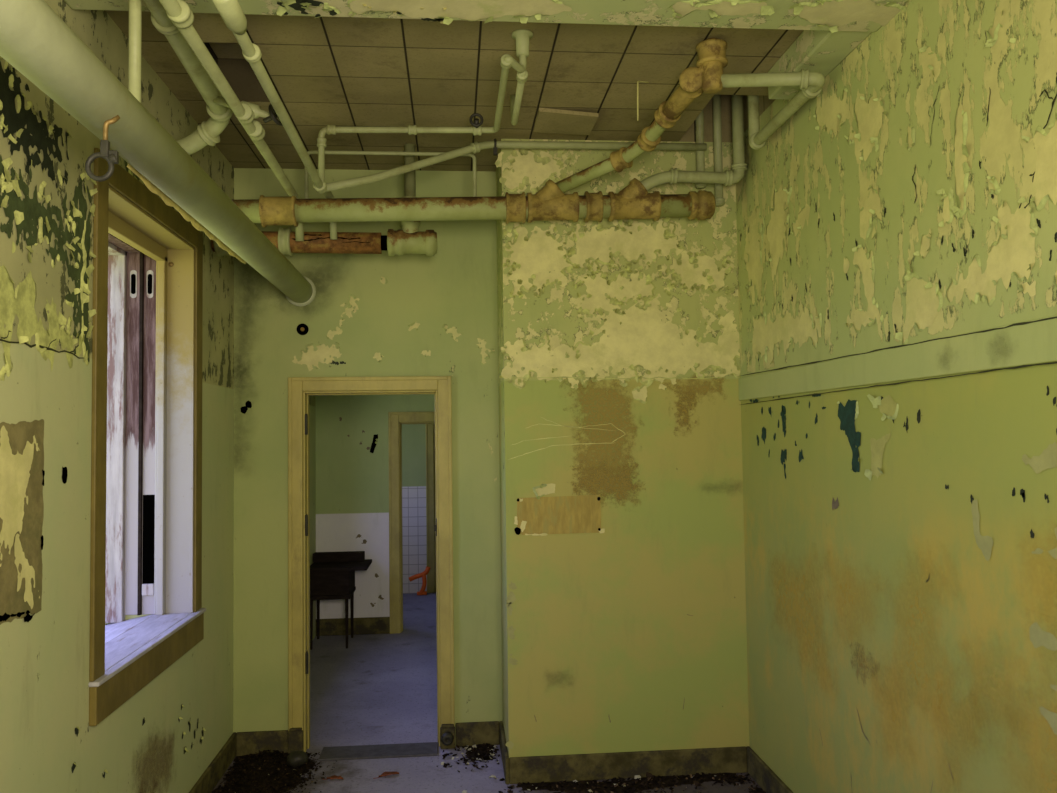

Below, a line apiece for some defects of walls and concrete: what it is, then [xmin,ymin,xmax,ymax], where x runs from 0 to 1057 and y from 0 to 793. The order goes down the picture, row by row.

peeling [276,0,572,25]
peeling [666,0,775,19]
peeling [788,0,904,33]
peeling [813,85,889,164]
peeling [0,56,98,381]
peeling [843,99,1057,345]
peeling [292,294,360,371]
peeling [476,185,829,404]
water stain [574,380,638,501]
peeling [750,393,921,481]
peeling [0,419,45,625]